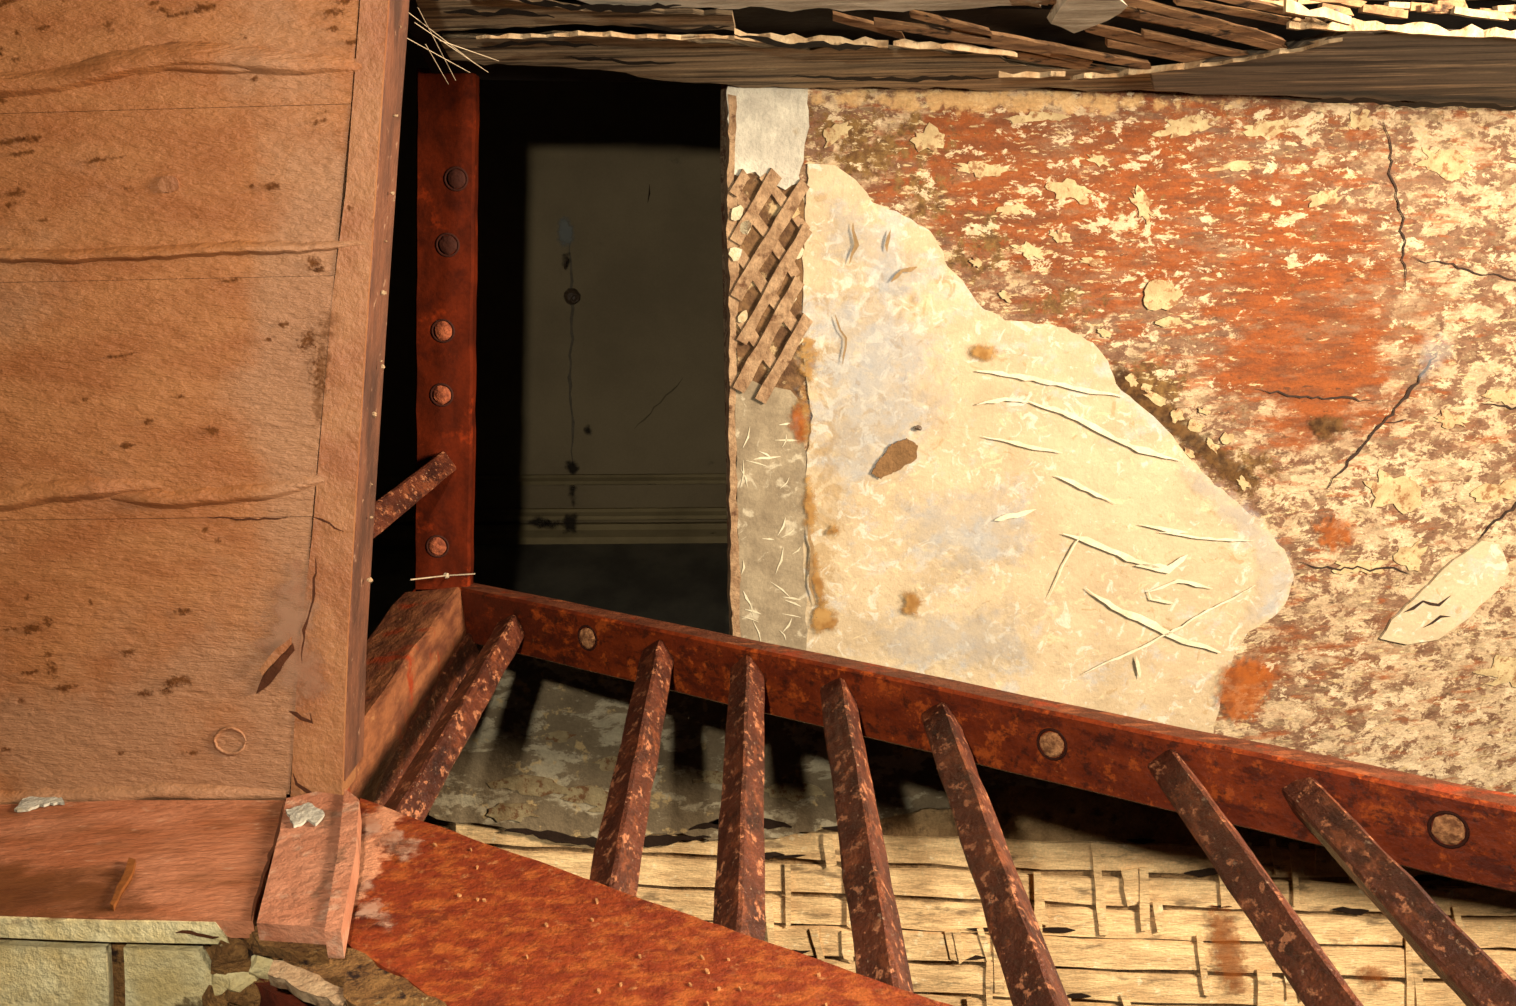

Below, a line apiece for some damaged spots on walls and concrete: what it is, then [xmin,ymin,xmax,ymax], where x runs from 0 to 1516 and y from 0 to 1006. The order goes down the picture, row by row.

crack [433,0,998,82]
peeling [1242,118,1305,137]
peeling [1347,109,1373,131]
peeling [1304,186,1342,207]
crack [1272,97,1516,294]
peeling [1415,147,1473,181]
peeling [723,94,1294,734]
crack [1258,352,1438,489]
crack [1478,503,1516,541]
crack [210,516,344,660]
rust [1216,658,1271,721]